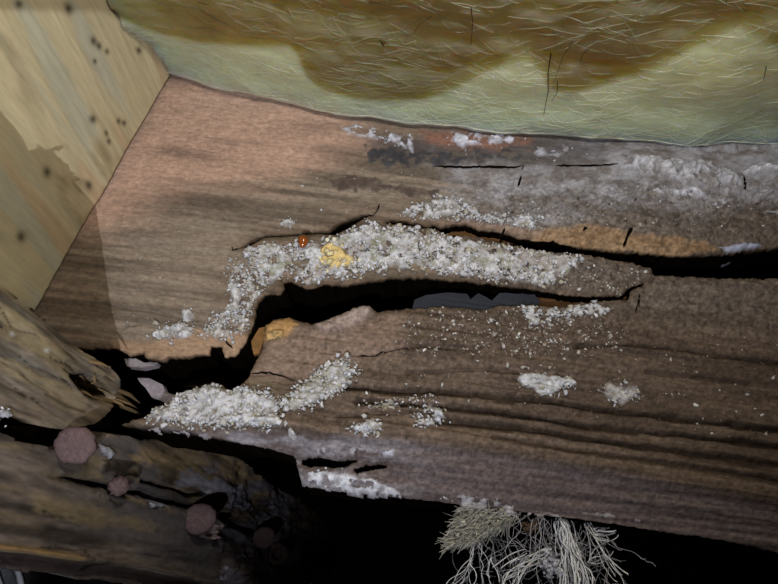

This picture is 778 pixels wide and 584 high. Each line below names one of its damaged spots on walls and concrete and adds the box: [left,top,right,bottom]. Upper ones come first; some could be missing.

leakage [557,143,778,206]
crack [623,227,633,248]
crack [282,305,341,324]
crack [212,341,293,391]
crack [85,365,187,438]
crack [4,420,42,436]